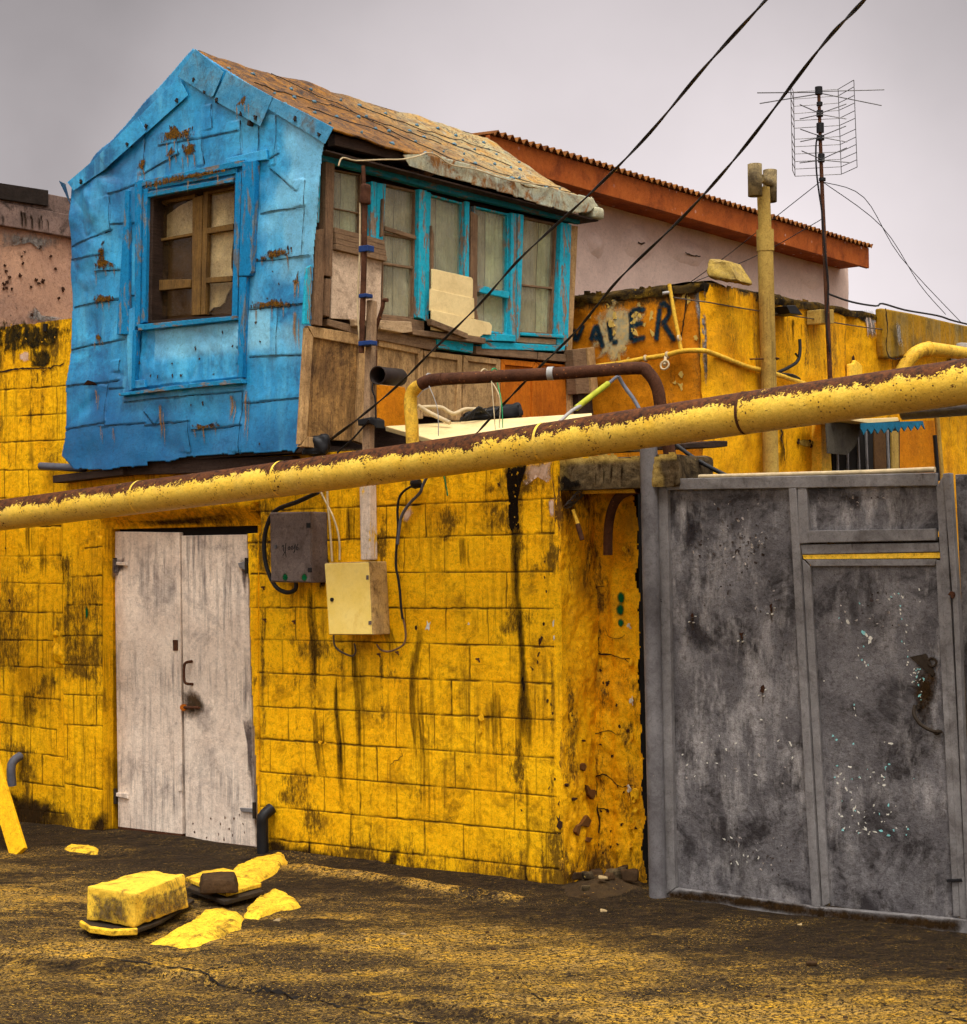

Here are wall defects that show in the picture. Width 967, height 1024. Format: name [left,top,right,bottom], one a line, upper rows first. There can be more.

corrosion [136,125,234,192]
spalling [2,250,45,291]
damp [0,308,68,367]
corrosion [94,241,118,280]
corrosion [250,245,300,343]
peeling [576,286,664,360]
damp [506,465,530,738]
spalling [840,590,925,697]
damp [334,688,343,784]
damp [11,794,56,825]
spalling [548,778,639,854]
spalling [834,763,909,836]